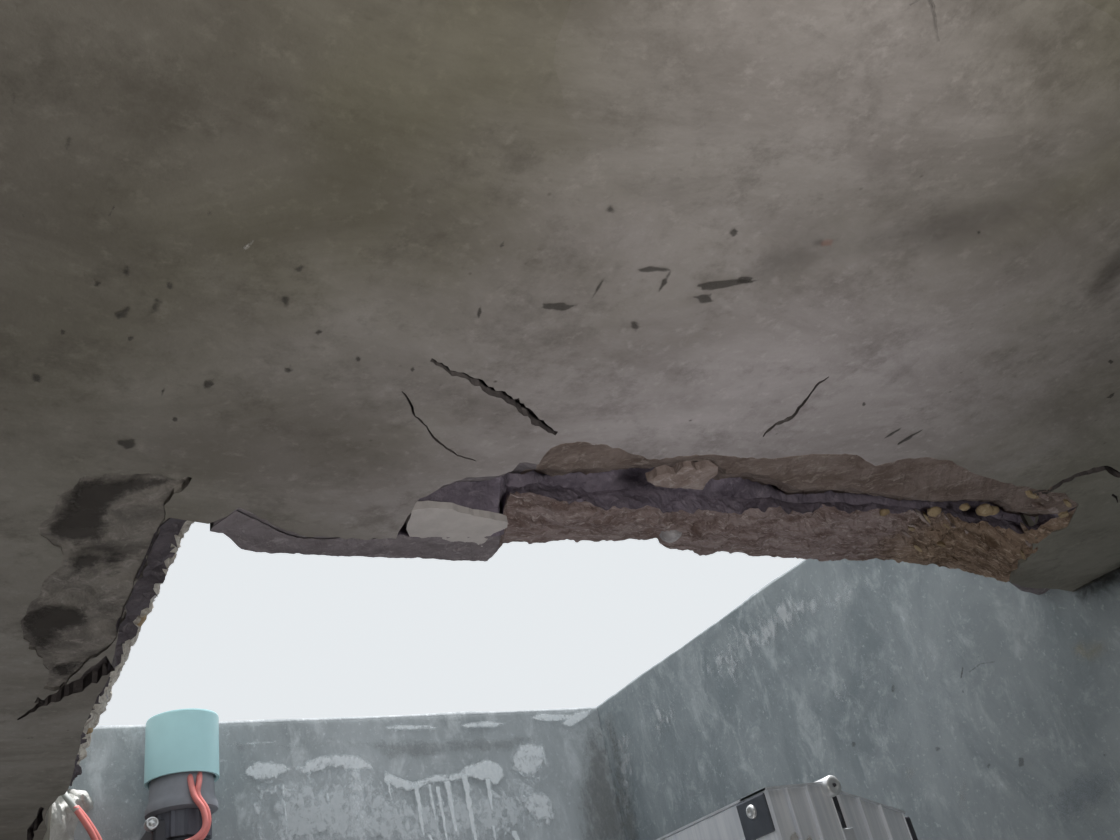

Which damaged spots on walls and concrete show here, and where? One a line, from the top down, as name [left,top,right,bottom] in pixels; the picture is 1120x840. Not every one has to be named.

crack [402,391,476,461]
crack [430,358,557,435]
crack [763,376,829,437]
spalling [210,442,1077,595]
crack [1032,466,1120,503]
peeling [21,473,194,786]
crack [17,649,115,720]
leakage [246,744,554,840]